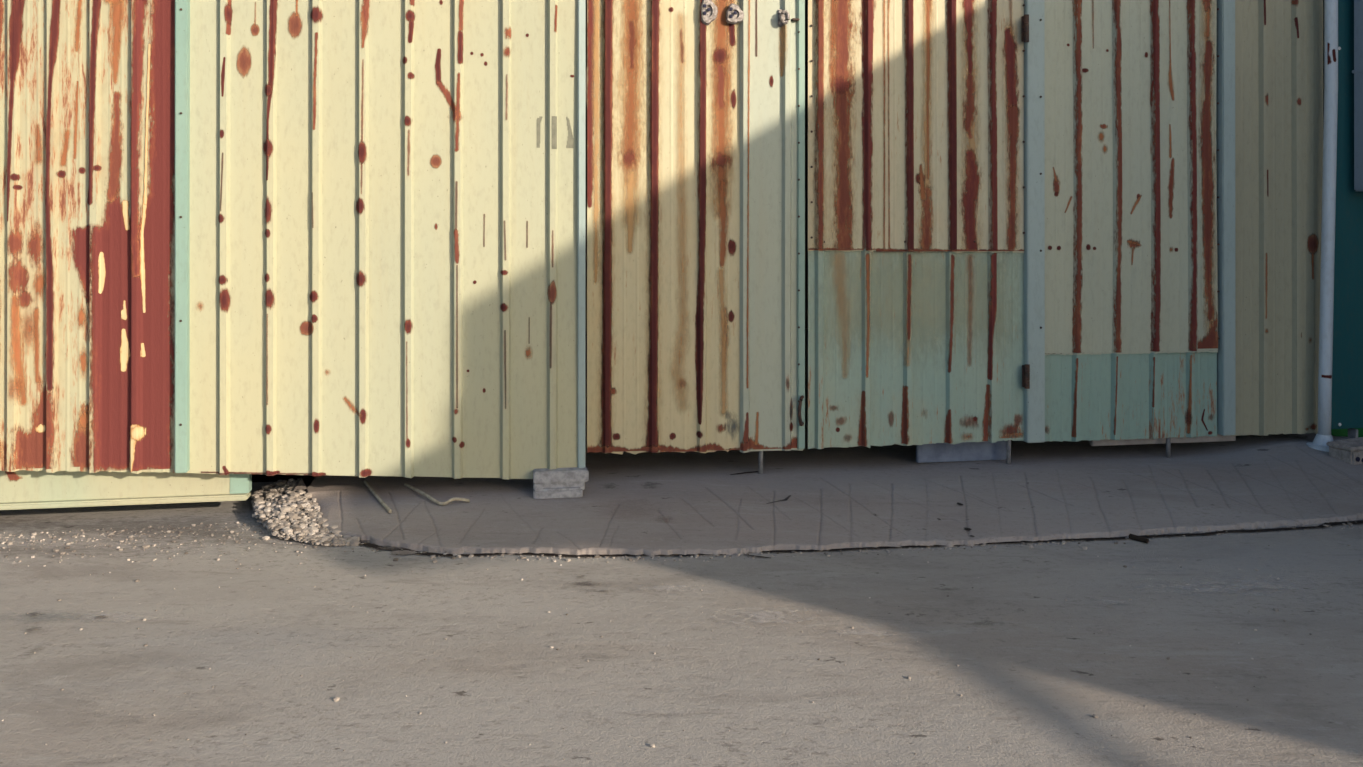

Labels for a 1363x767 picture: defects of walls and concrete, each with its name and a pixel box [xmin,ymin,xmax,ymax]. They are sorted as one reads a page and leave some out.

corrosion [221,0,323,181]
corrosion [356,0,370,214]
corrosion [403,0,415,79]
corrosion [435,0,487,152]
corrosion [0,0,175,481]
corrosion [219,275,230,312]
corrosion [265,273,274,405]
corrosion [300,290,318,335]
corrosion [356,271,366,287]
corrosion [570,0,797,453]
corrosion [808,0,1024,447]
corrosion [1048,0,1218,437]